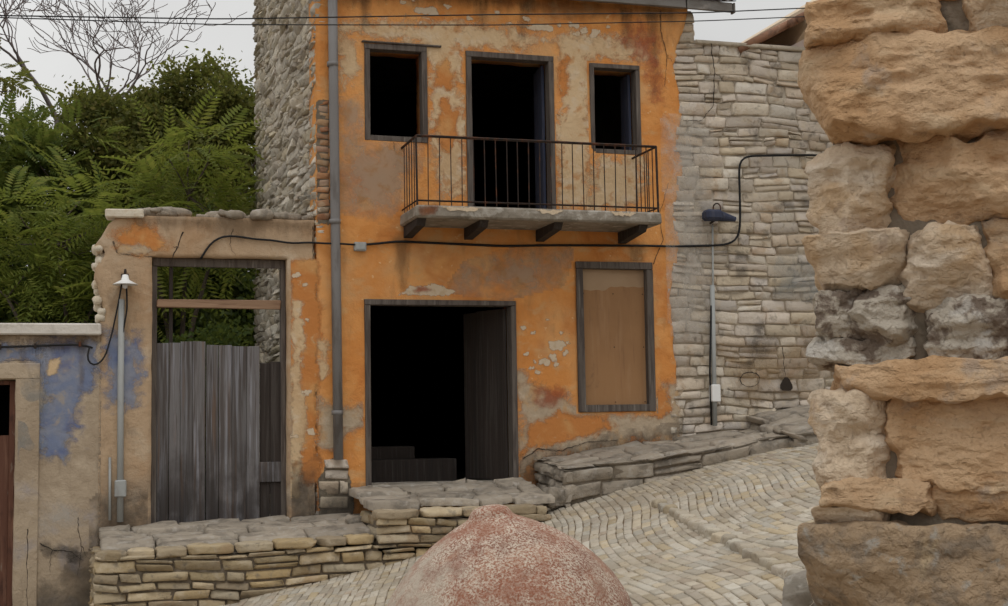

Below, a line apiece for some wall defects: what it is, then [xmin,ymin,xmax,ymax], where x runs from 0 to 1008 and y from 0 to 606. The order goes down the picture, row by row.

flaking render [338,0,657,217]
flaking render [91,222,168,323]
flaking render [47,358,60,376]
flaking render [290,300,364,498]
flaking render [517,331,683,477]